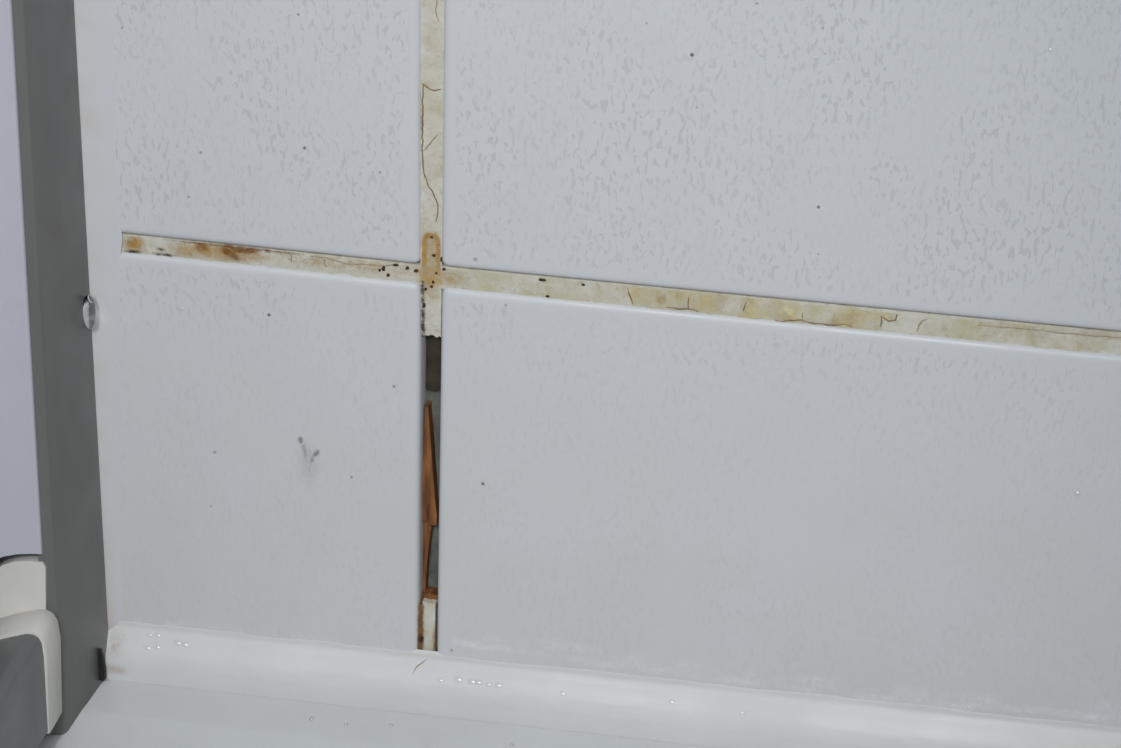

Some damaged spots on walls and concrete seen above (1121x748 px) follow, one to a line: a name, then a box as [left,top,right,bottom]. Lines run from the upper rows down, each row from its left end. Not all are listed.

crack [421,83,440,221]
rust [123,232,469,305]
water stain [378,254,446,337]
water stain [460,271,897,331]
crack [776,313,853,327]
crack [880,314,927,331]
crack [977,325,1121,338]
water stain [417,601,1121,724]